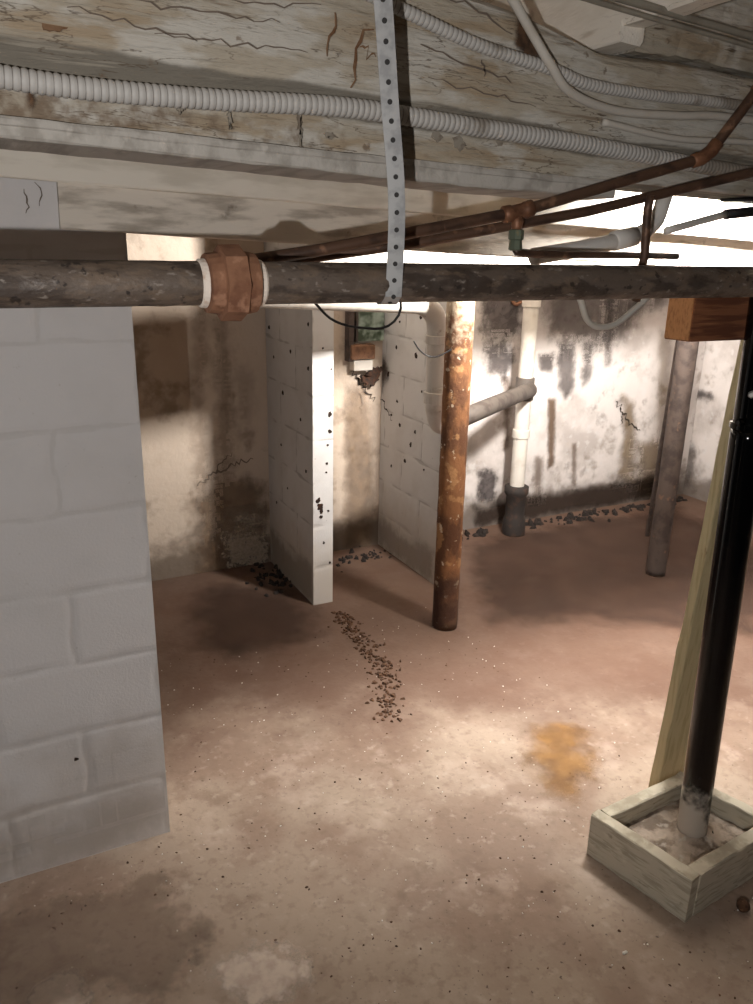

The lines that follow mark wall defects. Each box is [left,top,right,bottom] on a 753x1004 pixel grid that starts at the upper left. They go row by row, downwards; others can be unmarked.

crack [67,0,337,55]
crack [350,29,376,88]
water stain [482,301,522,381]
water stain [540,299,638,396]
water stain [197,478,268,573]
water stain [475,469,506,526]
corrosion [533,726,592,791]